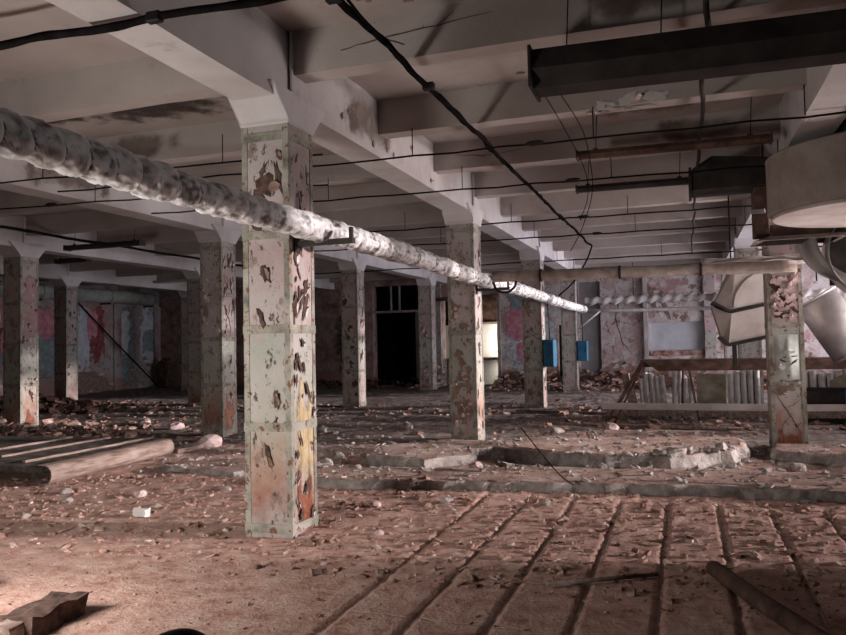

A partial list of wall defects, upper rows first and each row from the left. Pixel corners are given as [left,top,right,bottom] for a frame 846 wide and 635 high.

peeling [253,149,282,198]
peeling [260,265,271,283]
peeling [292,247,312,325]
spalling [769,272,800,320]
flaking render [67,364,114,394]
flaking render [126,356,154,389]
peeling [295,338,318,418]
peeling [342,287,364,396]
peeling [450,297,484,436]
peeling [506,313,560,397]
peeling [774,379,802,396]
peeling [297,470,316,521]